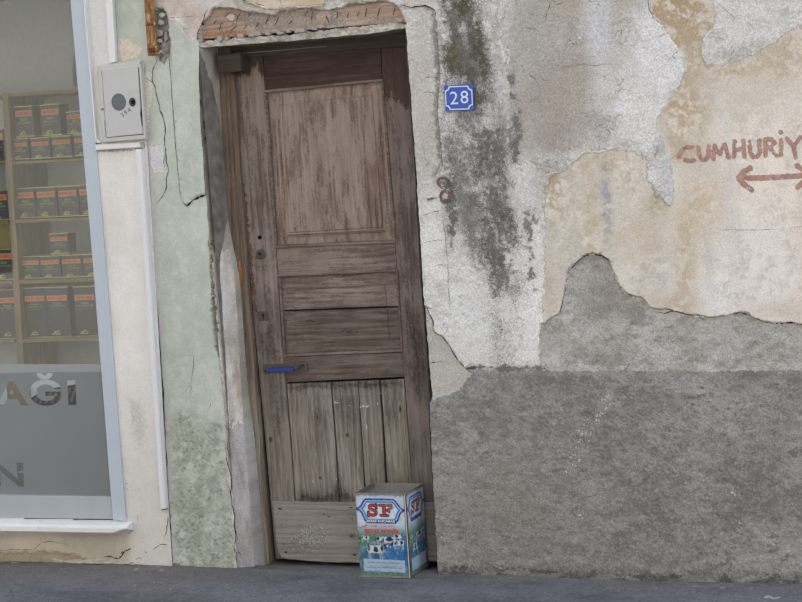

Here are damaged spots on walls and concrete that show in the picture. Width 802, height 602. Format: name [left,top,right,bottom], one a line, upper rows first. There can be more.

crack [145,10,208,199]
peeling [155,0,325,63]
water stain [437,0,525,312]
peeling [467,0,514,72]
peeling [539,0,802,372]